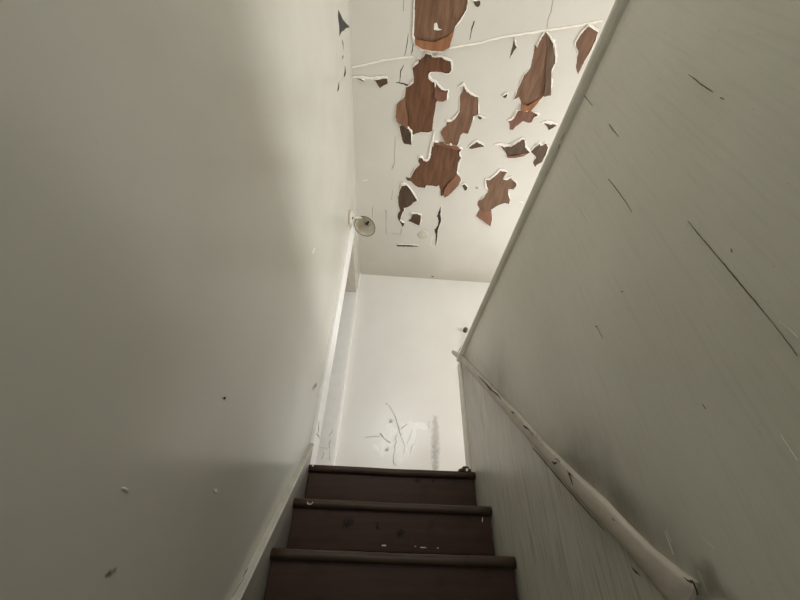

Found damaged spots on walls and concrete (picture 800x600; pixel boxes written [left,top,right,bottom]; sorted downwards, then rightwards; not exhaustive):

peeling [574,22,599,73]
peeling [352,76,388,88]
peeling [394,0,564,227]
crack [691,225,798,356]
crack [365,409,414,464]